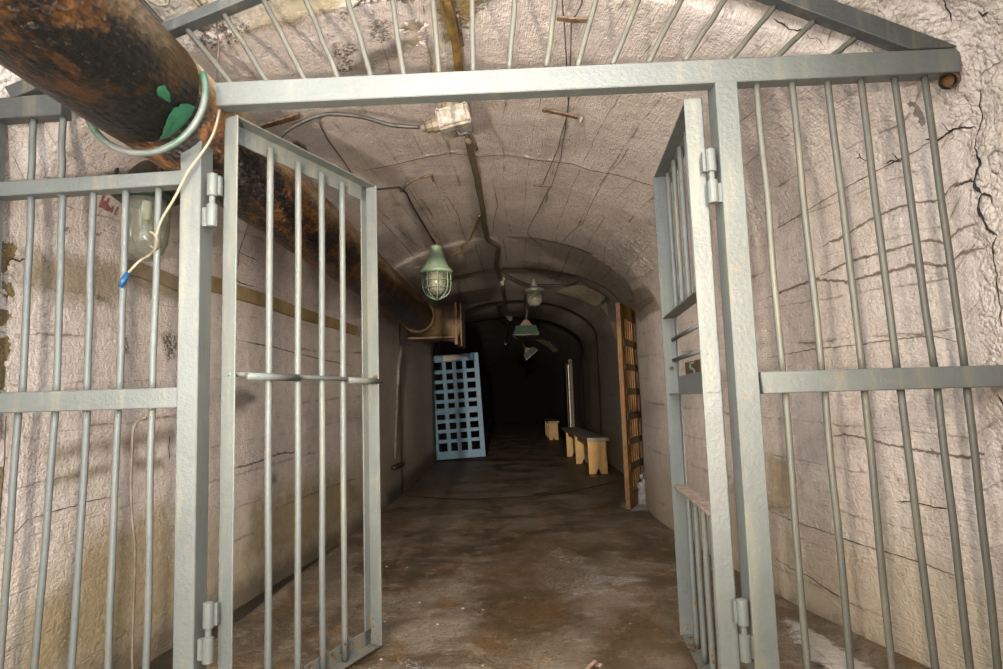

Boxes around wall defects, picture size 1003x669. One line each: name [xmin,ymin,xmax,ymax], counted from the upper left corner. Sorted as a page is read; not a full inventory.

crack [365,148,652,283]